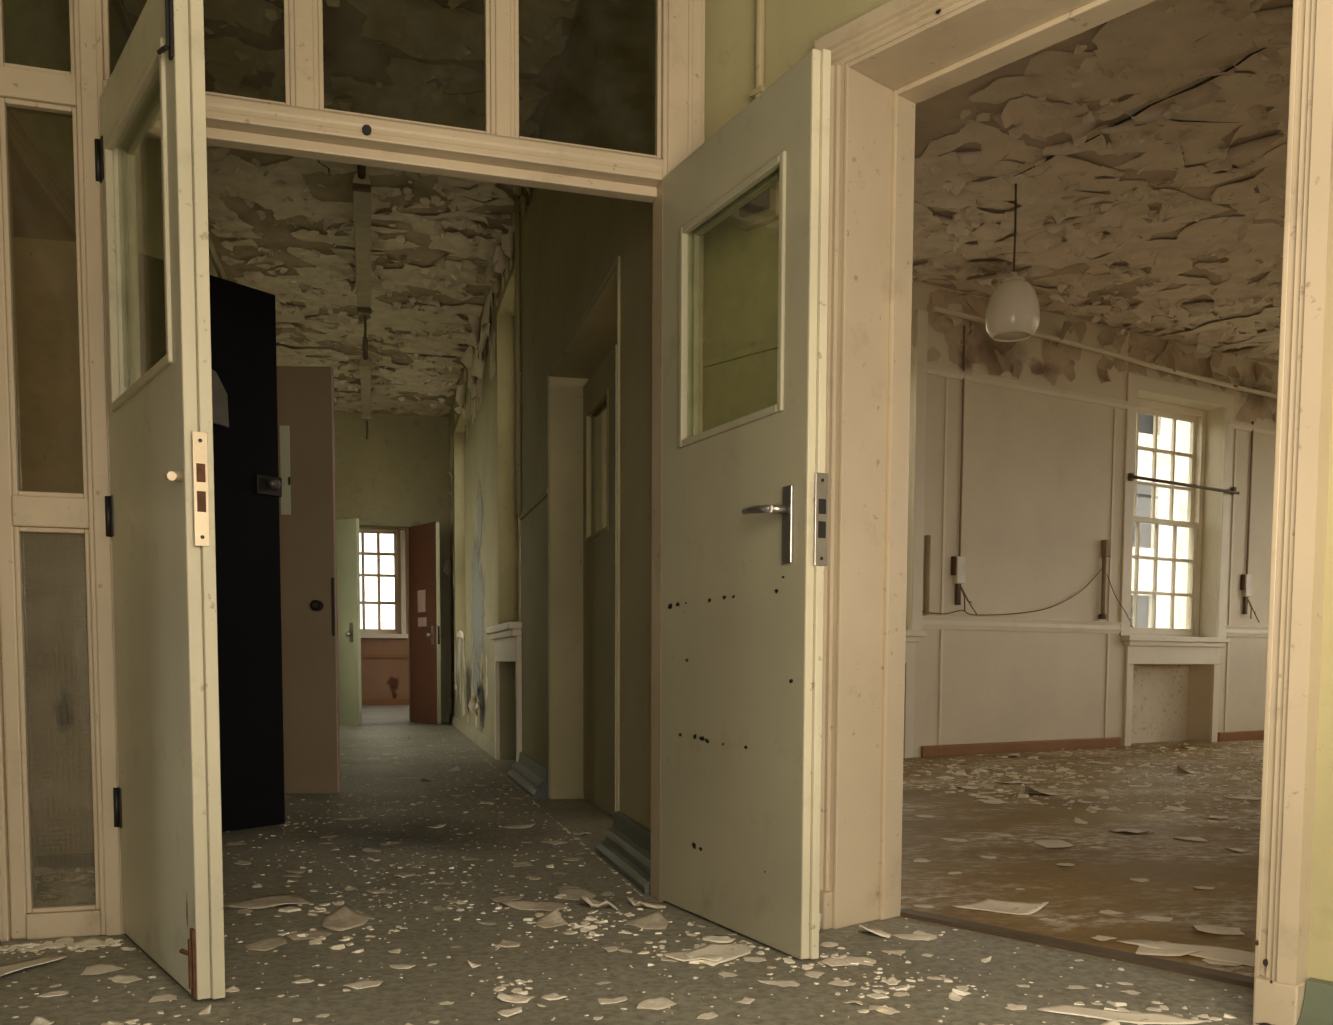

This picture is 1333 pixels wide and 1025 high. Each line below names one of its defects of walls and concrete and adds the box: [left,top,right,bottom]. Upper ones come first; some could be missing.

peeling [123,0,147,17]
peeling [203,0,286,104]
peeling [322,0,485,131]
peeling [519,0,578,137]
crack [1085,48,1266,143]
crack [1013,155,1055,177]
peeling [912,0,1293,423]
peeling [207,145,531,599]
flaking render [448,481,488,727]